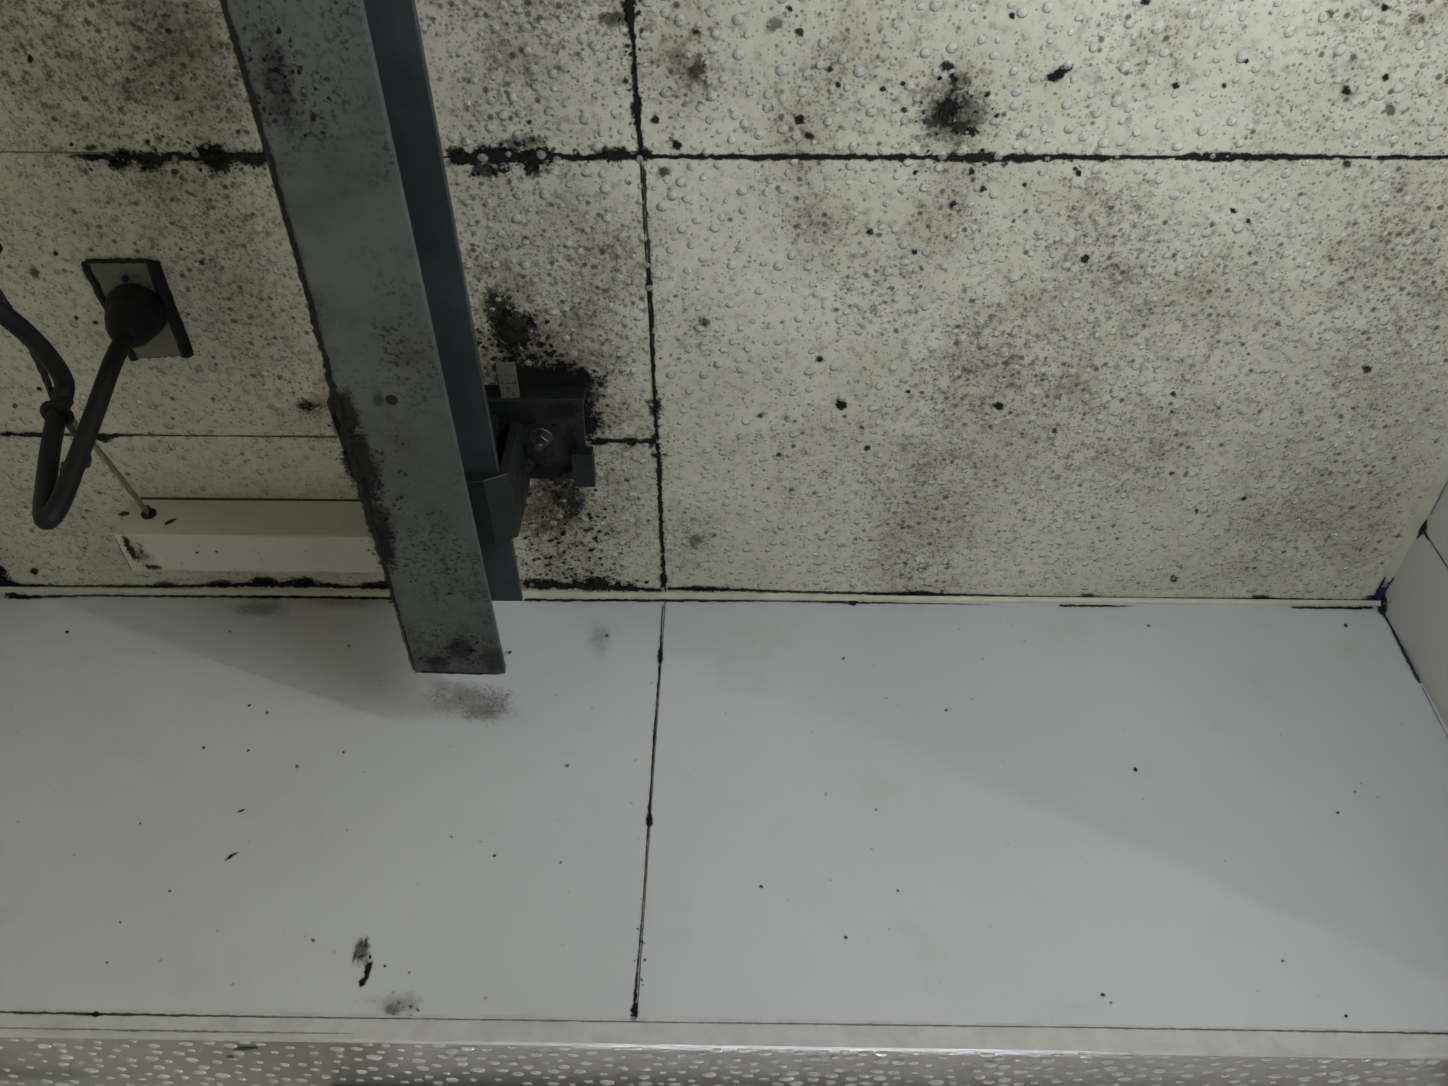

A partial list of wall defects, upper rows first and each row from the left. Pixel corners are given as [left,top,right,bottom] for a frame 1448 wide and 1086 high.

water stain [0,0,512,719]
water stain [445,0,1448,1020]